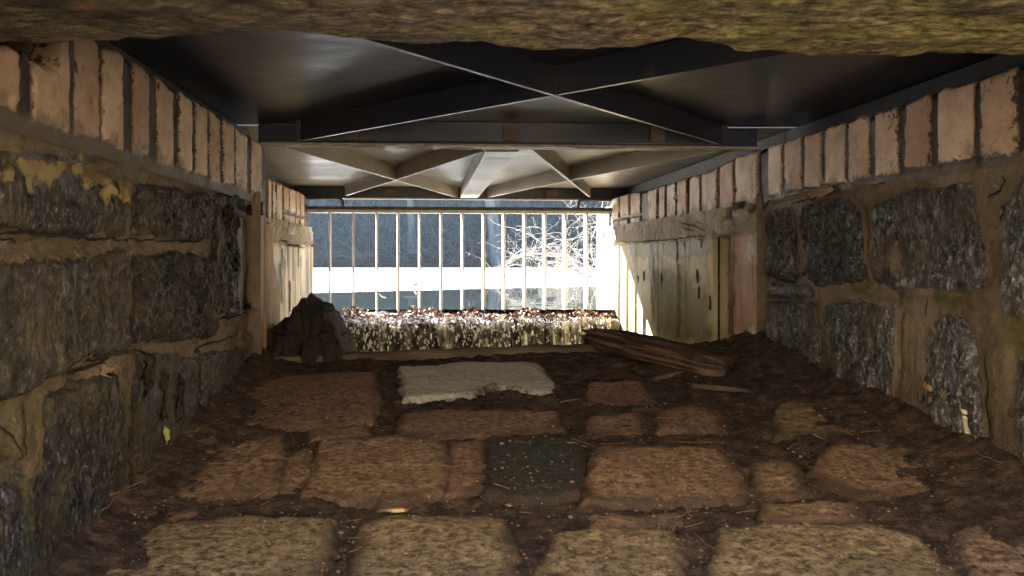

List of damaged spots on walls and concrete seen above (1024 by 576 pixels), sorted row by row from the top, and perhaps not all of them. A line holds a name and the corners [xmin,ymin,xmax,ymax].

peeling [4,145,131,204]
crack [988,176,1006,223]